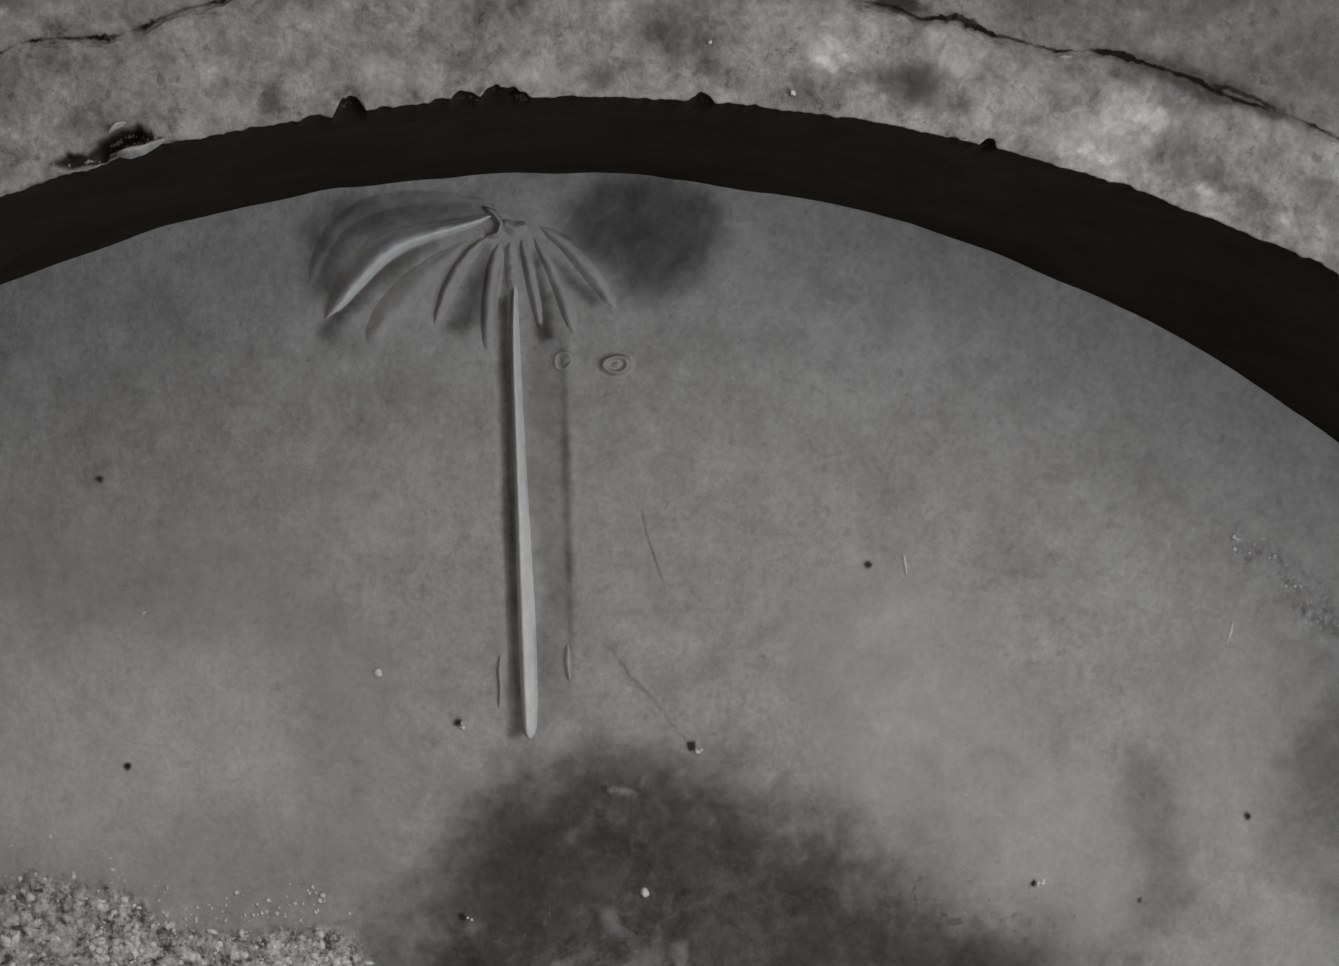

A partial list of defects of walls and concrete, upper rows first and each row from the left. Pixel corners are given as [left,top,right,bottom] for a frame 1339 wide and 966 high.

crack [0,0,234,54]
crack [806,0,1273,110]
spalling [52,122,166,169]
crack [1306,122,1339,148]